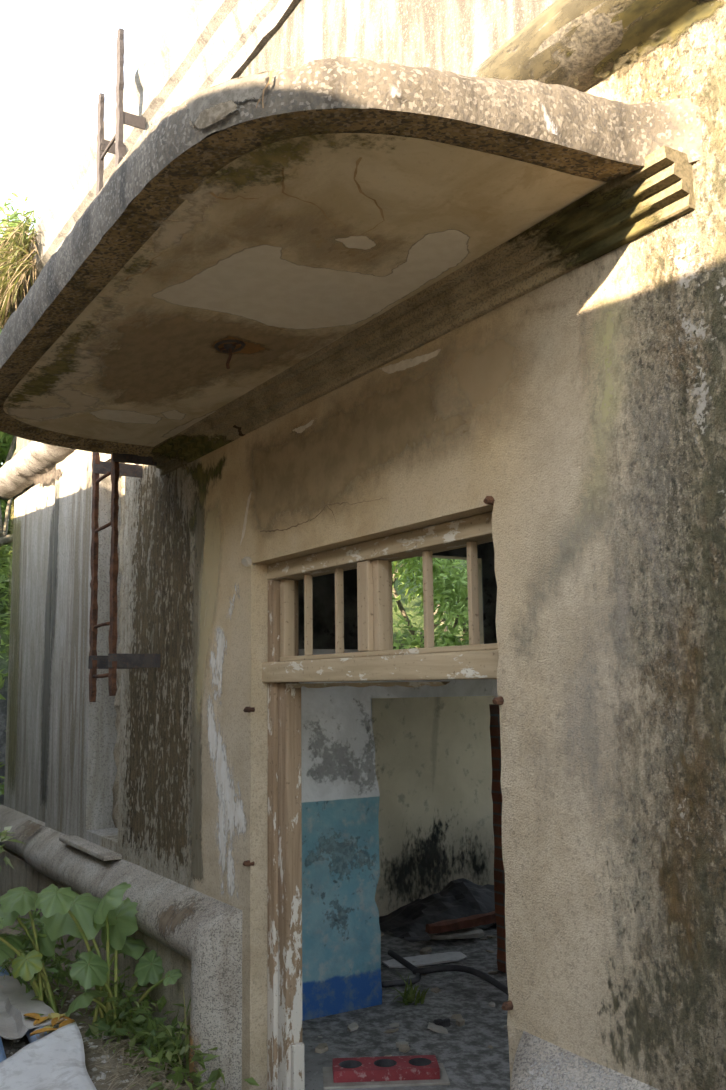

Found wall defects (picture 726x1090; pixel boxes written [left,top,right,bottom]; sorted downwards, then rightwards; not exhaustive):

damp [8,180,334,420]
peeling [152,230,470,329]
damp [508,179,675,270]
damp [251,339,514,531]
damp [602,51,726,1090]
damp [122,465,247,941]
damp [384,822,487,902]